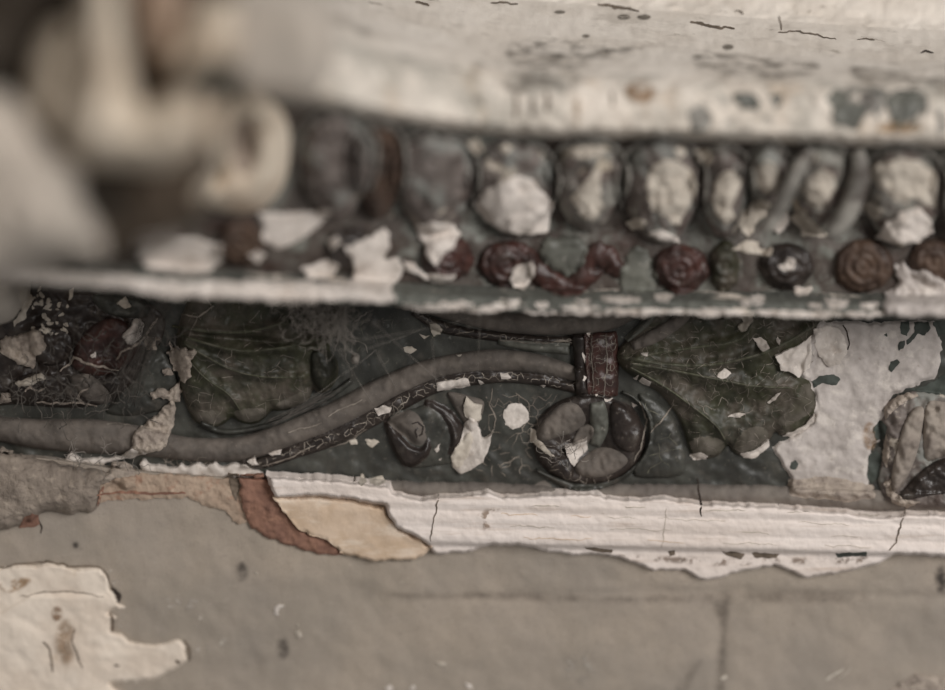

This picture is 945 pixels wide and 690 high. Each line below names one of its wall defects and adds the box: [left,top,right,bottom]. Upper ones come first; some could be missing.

crack [598,3,639,12]
crack [690,10,743,29]
crack [778,16,875,40]
peeling [474,175,553,235]
peeling [626,145,713,243]
peeling [862,158,940,244]
spalling [0,221,945,508]
spalling [65,446,432,562]
crack [430,494,439,542]
crack [501,478,773,547]
crack [788,508,907,551]
peeling [0,560,191,690]